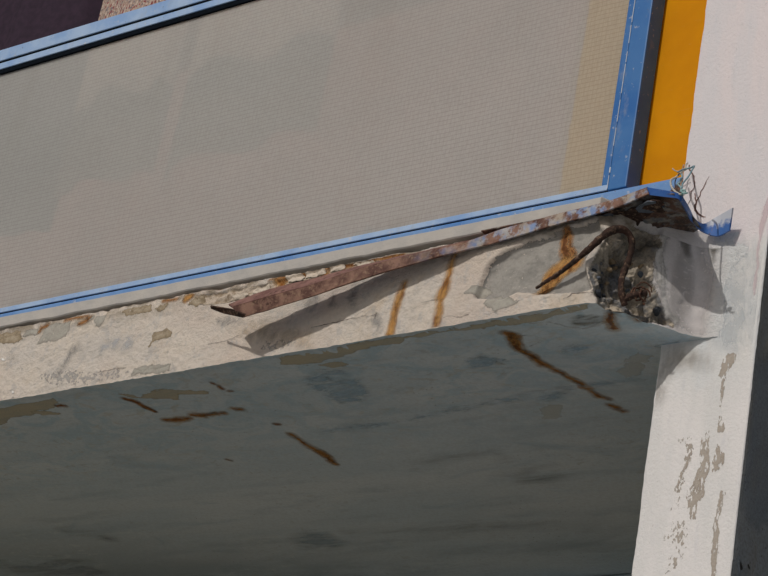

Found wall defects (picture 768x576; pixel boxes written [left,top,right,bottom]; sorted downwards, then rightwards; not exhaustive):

crack [689,165,709,217]
peeling [0,315,106,344]
peeling [148,328,172,347]
rust [122,398,243,422]
spalling [188,260,376,307]
rust [386,282,406,336]
rust [433,253,457,327]
spalling [262,220,674,368]
rust [539,227,583,295]
rust [502,331,626,412]
peeling [717,353,736,433]
peeling [664,432,726,576]